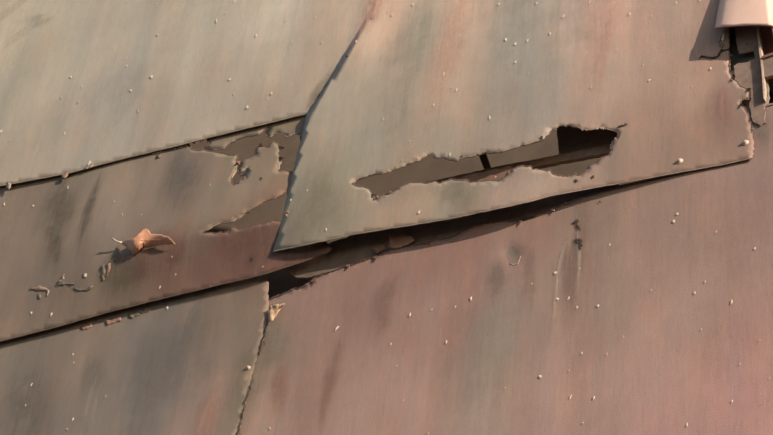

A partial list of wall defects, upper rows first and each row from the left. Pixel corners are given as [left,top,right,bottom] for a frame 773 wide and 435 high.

crack [699,44,729,59]
peeling [30,263,111,299]